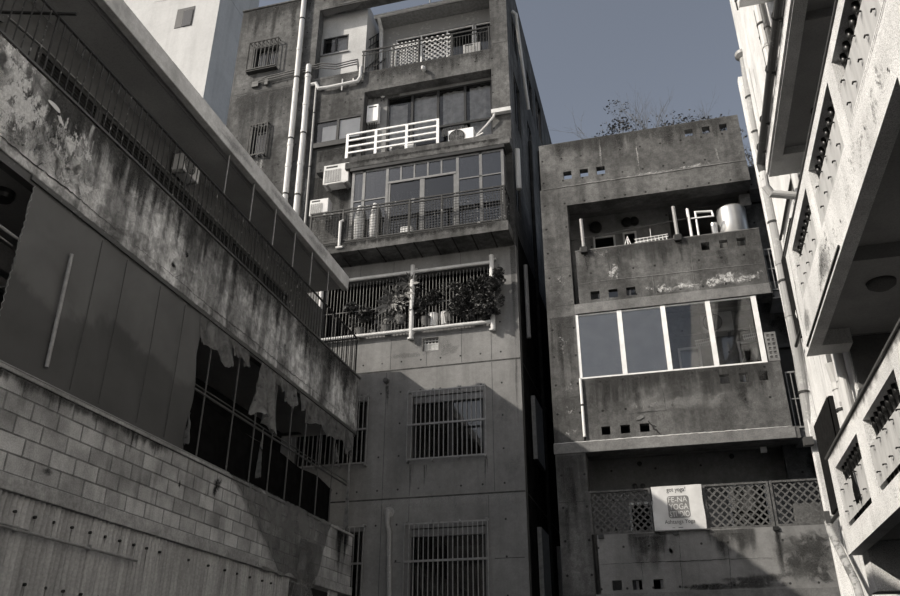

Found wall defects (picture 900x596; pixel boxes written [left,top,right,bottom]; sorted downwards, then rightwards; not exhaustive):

damp [10,83,354,387]
damp [685,528,832,589]